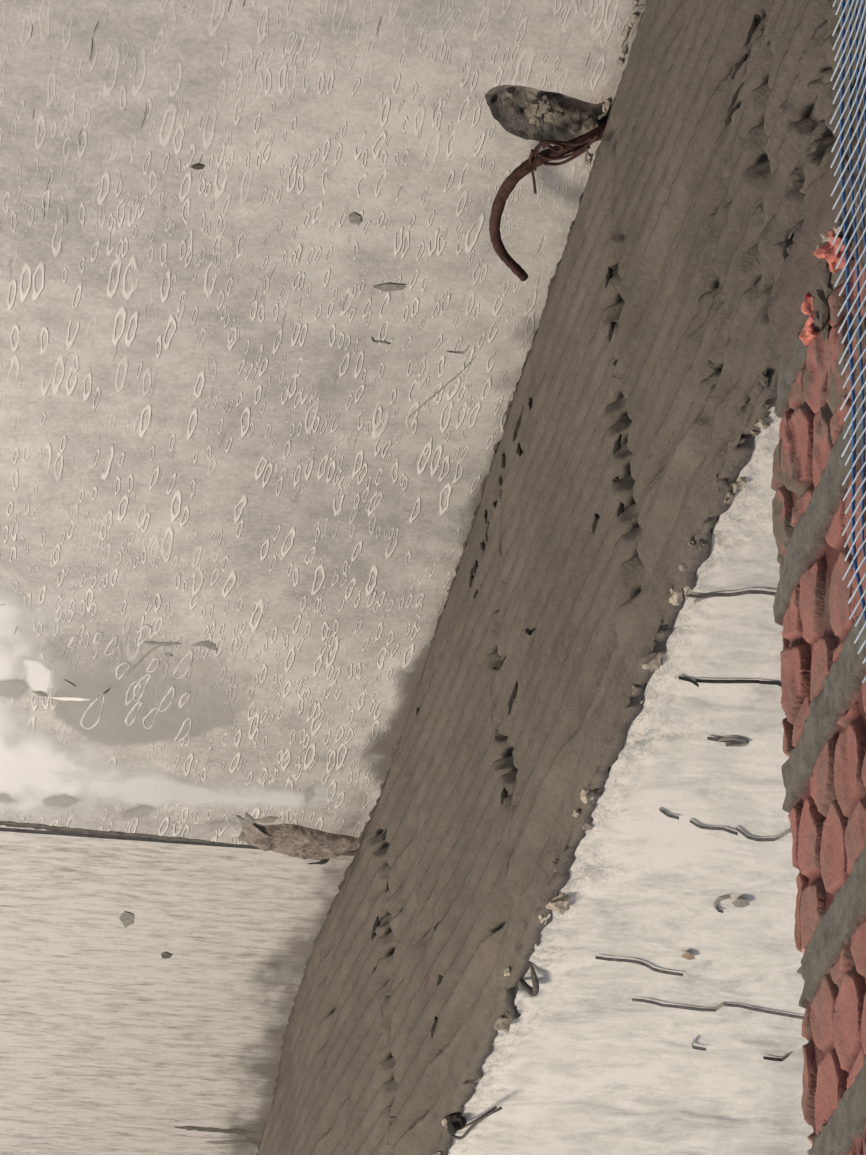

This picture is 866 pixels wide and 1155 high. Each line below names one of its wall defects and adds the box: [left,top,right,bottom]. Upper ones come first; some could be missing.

spalling [485,85,612,281]
crack [682,590,776,604]
crack [679,676,782,687]
damp [0,591,326,813]
peeling [44,795,77,807]
crack [660,808,791,842]
spalling [209,813,360,865]
crack [595,956,683,976]
crack [632,998,804,1019]